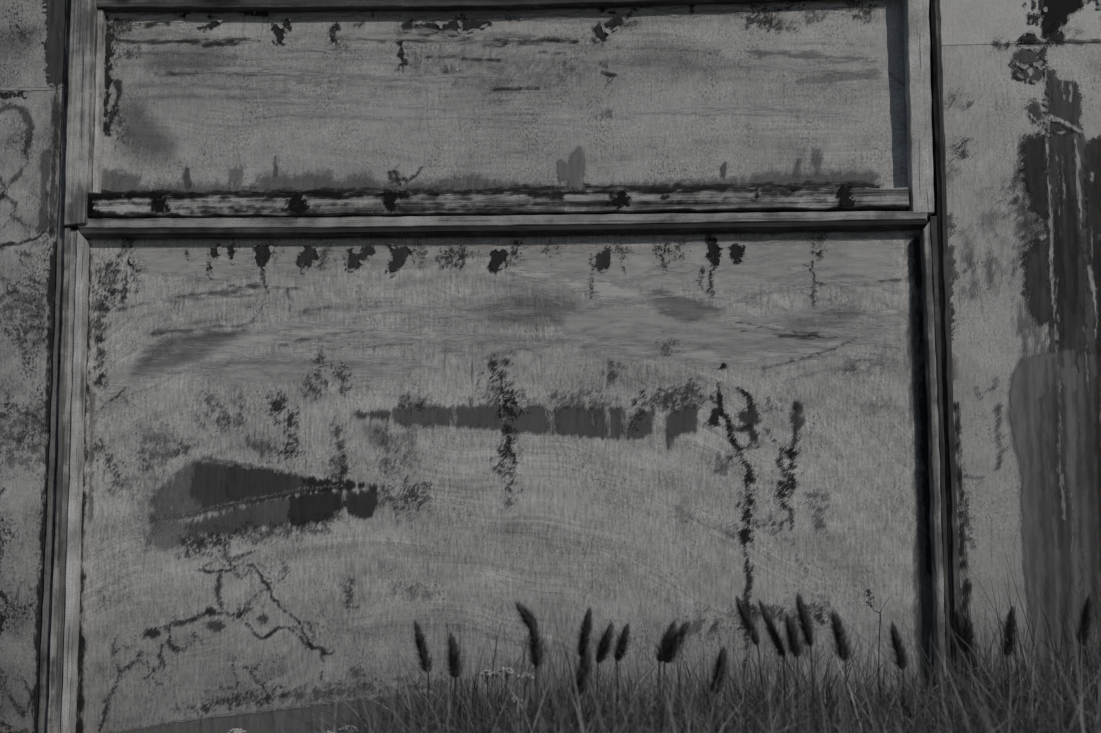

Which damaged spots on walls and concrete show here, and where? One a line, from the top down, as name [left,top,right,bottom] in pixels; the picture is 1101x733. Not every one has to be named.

peeling [329,12,492,59]
peeling [1008,0,1101,137]
crack [0,101,48,250]
crack [1,276,45,310]
peeling [253,238,529,293]
peeling [589,235,633,300]
peeling [696,234,746,296]
water stain [1009,70,1101,705]
water stain [75,231,935,733]
crack [0,530,8,634]
crack [98,539,334,732]
crack [0,677,34,733]